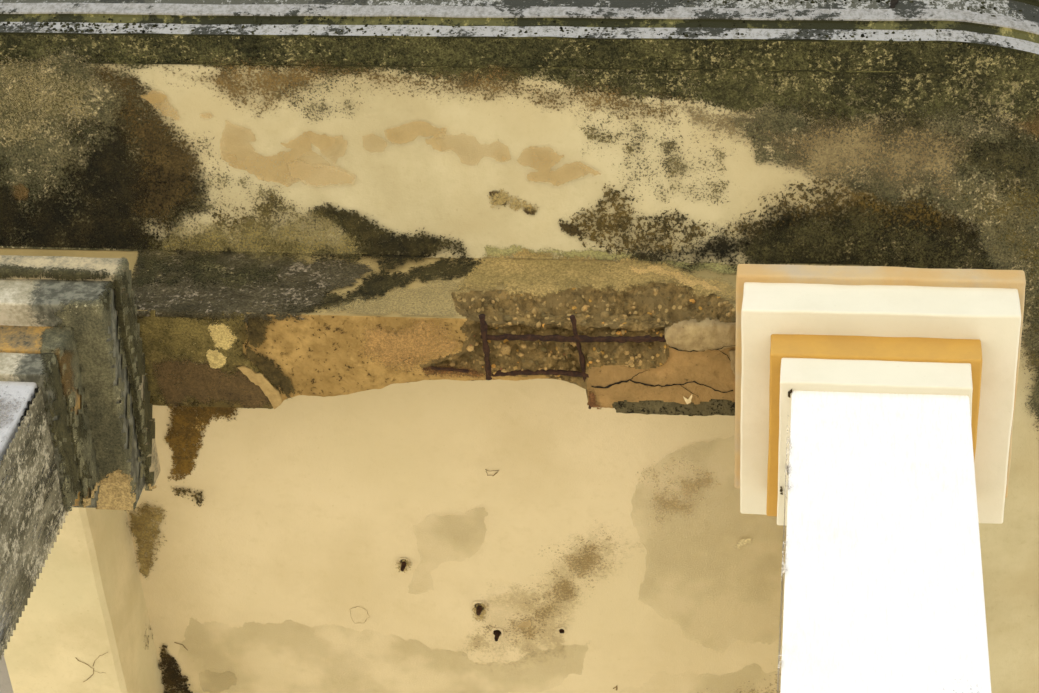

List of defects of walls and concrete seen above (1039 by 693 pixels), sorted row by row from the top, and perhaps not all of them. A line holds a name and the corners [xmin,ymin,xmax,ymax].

peeling [222,131,336,187]
peeling [385,121,444,152]
spalling [489,188,538,215]
water stain [0,34,1039,439]
peeling [523,146,601,186]
peeling [206,322,286,409]
spalling [420,282,736,409]
crack [591,370,733,396]
water stain [165,406,238,507]
water stain [126,504,167,578]